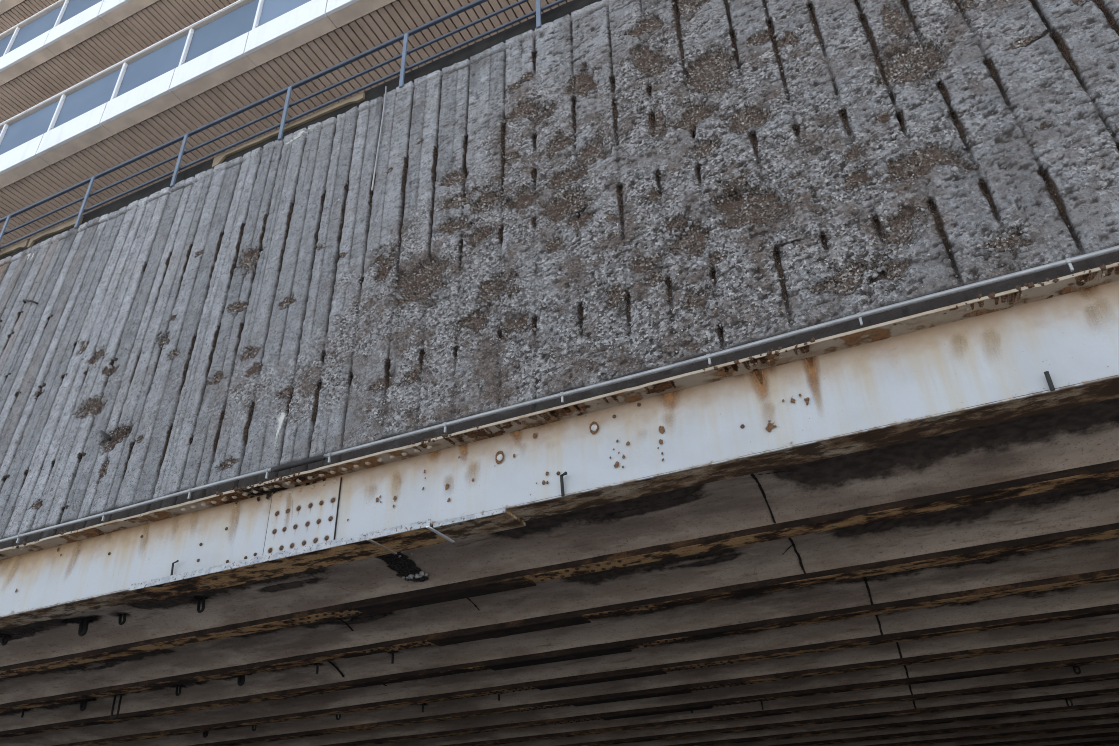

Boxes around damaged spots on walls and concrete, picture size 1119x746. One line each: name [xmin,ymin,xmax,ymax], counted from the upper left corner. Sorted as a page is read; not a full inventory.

corrosion [712,323,897,405]
corrosion [312,380,322,423]
corrosion [603,380,678,405]
corrosion [201,403,590,507]
leakage [773,398,1119,490]
leakage [489,484,704,539]
crack [750,471,806,574]
leakage [127,567,327,609]
spalling [375,550,429,582]
leakage [562,548,741,585]
leakage [0,619,67,643]
crack [863,577,916,709]